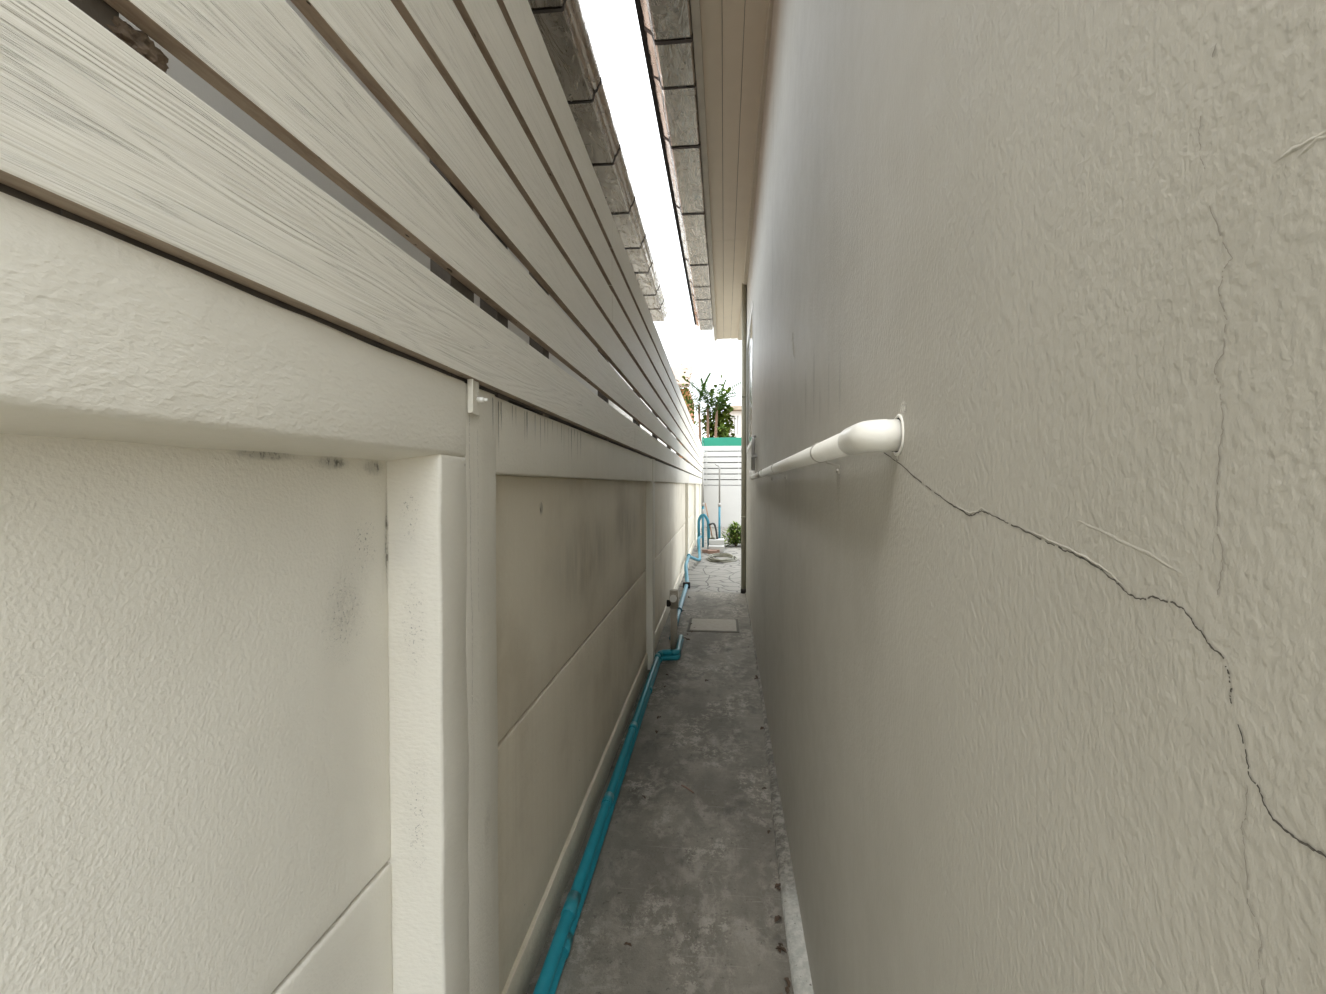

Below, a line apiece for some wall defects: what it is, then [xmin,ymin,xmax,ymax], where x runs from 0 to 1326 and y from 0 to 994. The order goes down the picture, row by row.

crack [1209,205,1233,595]
crack [884,453,1326,994]